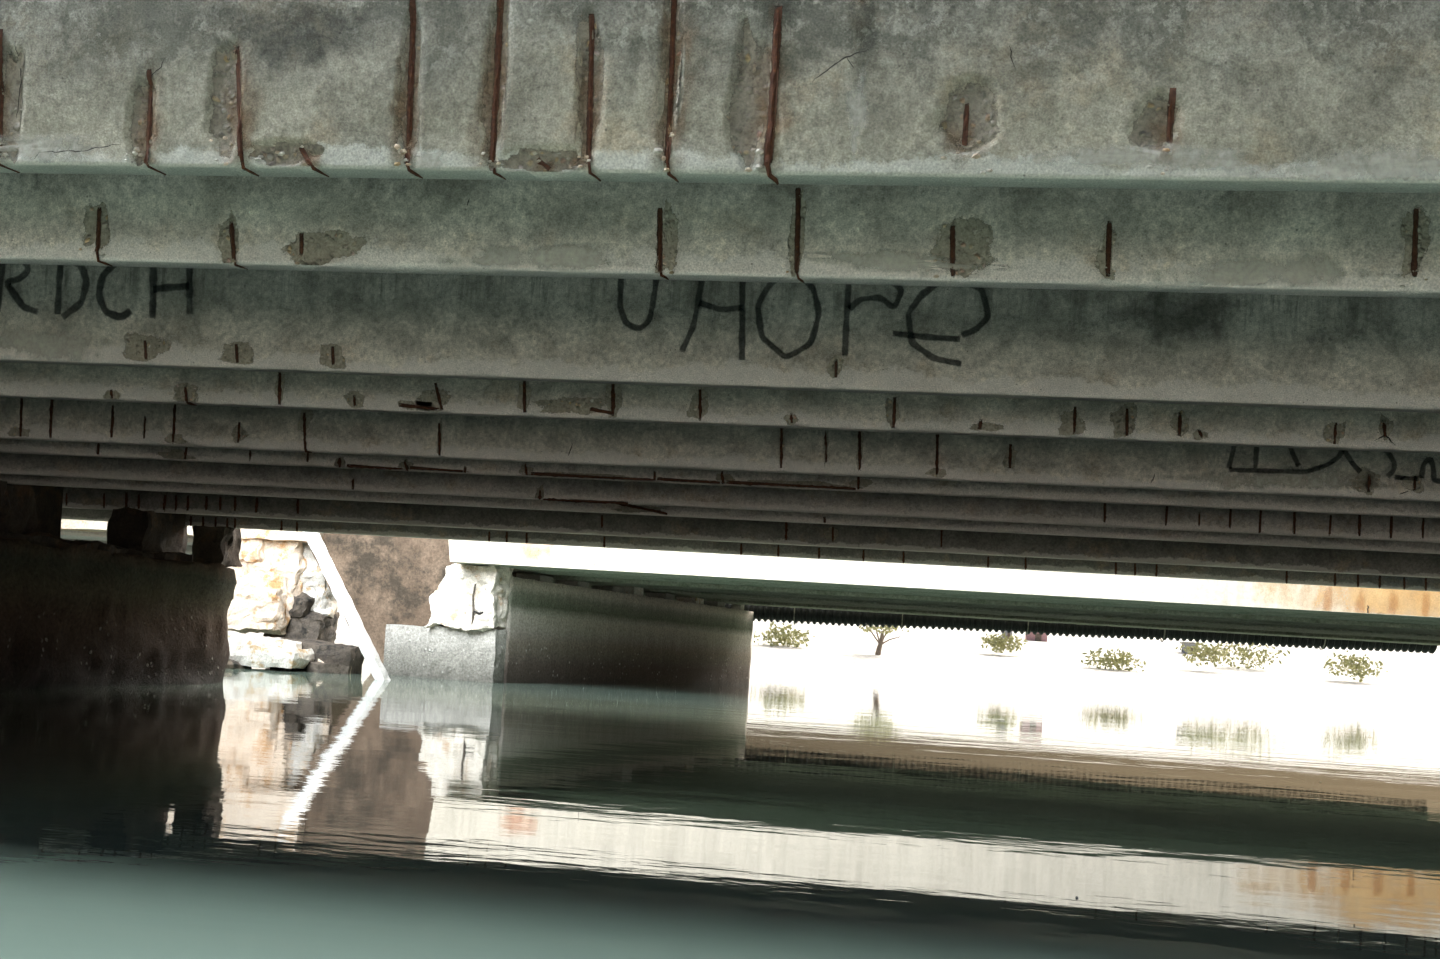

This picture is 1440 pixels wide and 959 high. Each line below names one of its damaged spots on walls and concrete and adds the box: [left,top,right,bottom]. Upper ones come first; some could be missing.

corrosion [1315,585,1440,617]